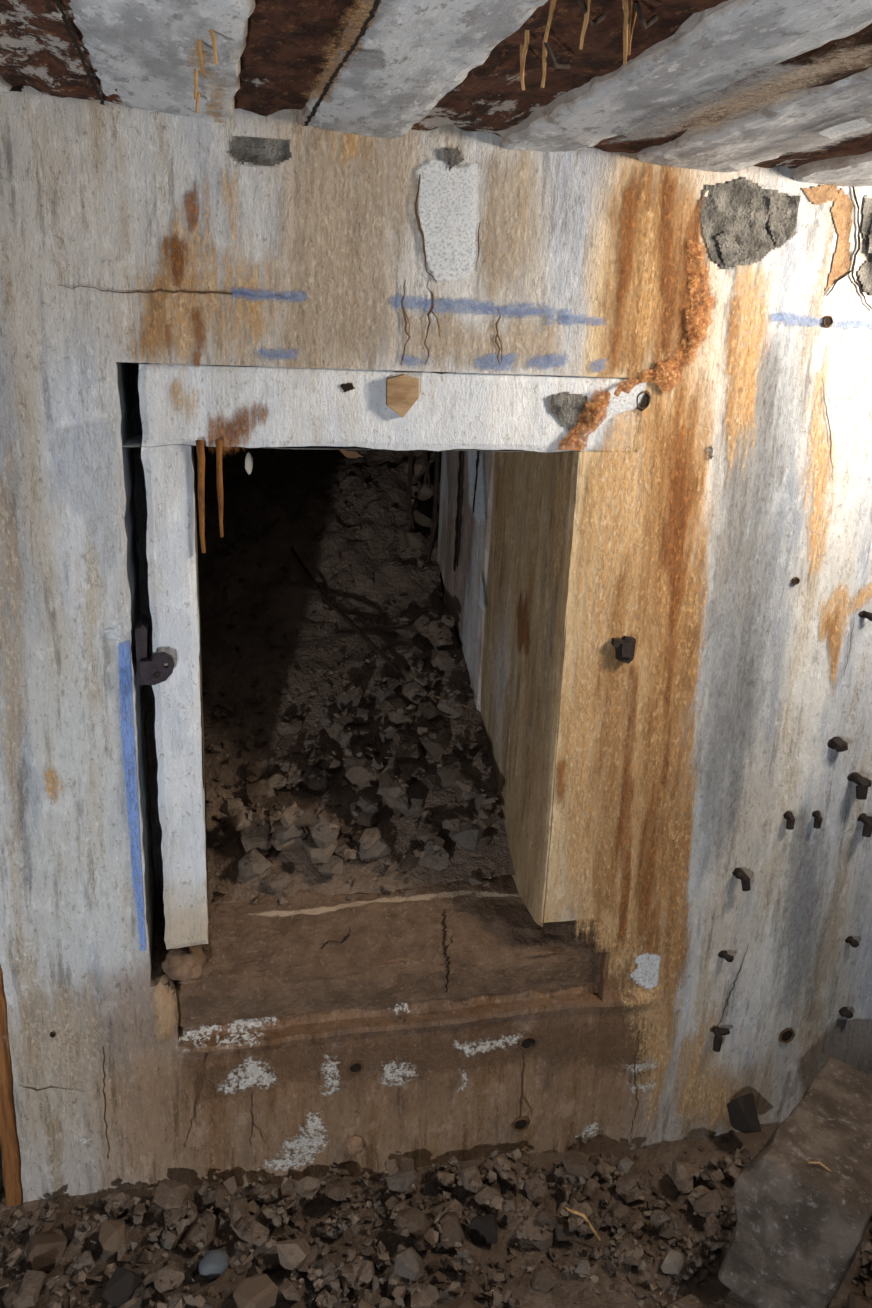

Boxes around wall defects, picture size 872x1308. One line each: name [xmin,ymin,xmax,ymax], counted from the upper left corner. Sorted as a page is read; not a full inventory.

peeling [339,50,384,70]
peeling [753,105,872,160]
crack [57,284,299,300]
rust [137,185,270,366]
crack [400,174,440,365]
crack [494,310,502,365]
spalling [546,177,872,451]
rust [725,263,770,468]
rust [195,405,267,553]
rust [550,165,712,1121]
water stain [176,1016,659,1096]
efflorescence [258,1112,328,1171]